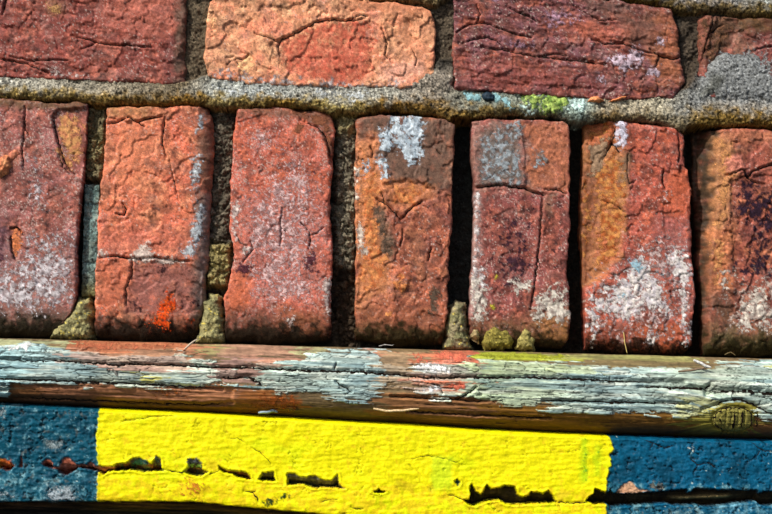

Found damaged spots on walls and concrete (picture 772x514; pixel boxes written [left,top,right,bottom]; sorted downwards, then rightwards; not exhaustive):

crack [255,15,368,49]
crack [117,117,176,190]
crack [104,256,189,300]
damp [470,192,491,348]
crack [475,184,565,304]
damp [501,277,571,351]
damp [584,232,694,356]
damp [701,270,772,358]
peeling [43,457,164,475]
peeling [287,473,342,488]
peeling [464,485,556,505]
peeling [587,480,772,507]